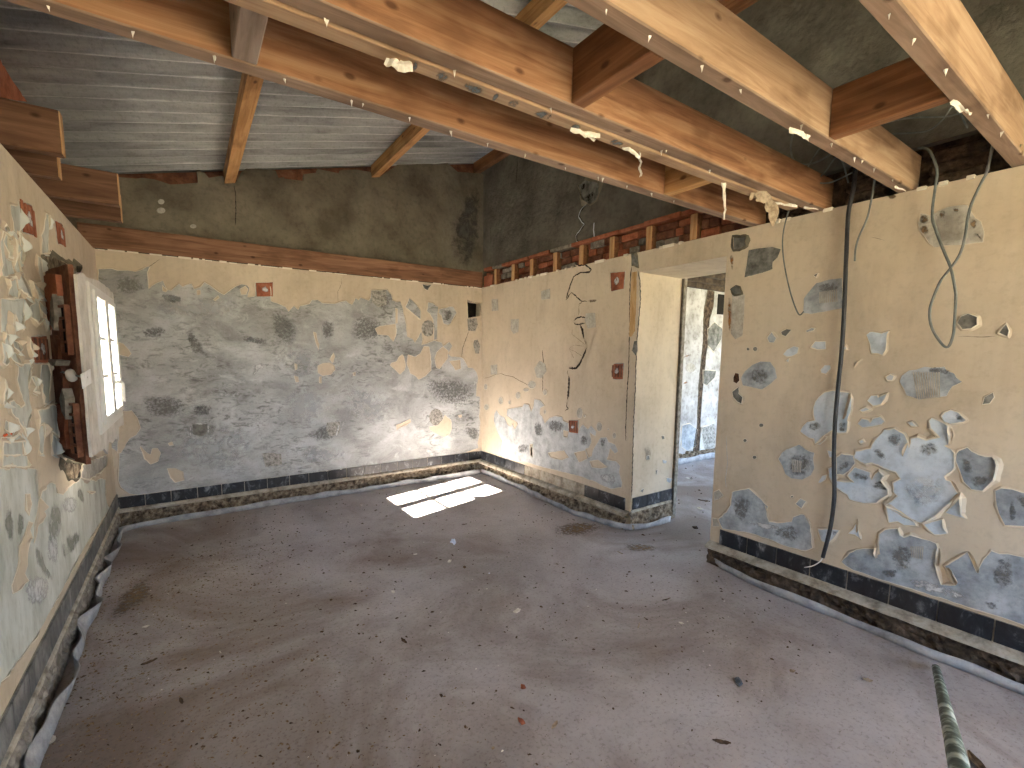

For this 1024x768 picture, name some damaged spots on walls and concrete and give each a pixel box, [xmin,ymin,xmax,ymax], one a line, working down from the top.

flaking render [731,234,750,252]
flaking render [730,285,743,296]
crack [487,206,595,412]
peeling [746,328,827,357]
peeling [866,330,890,356]
peeling [956,313,982,331]
peeling [996,322,1012,339]
peeling [0,199,675,768]
peeling [713,373,1024,627]
flaking render [706,549,1024,685]